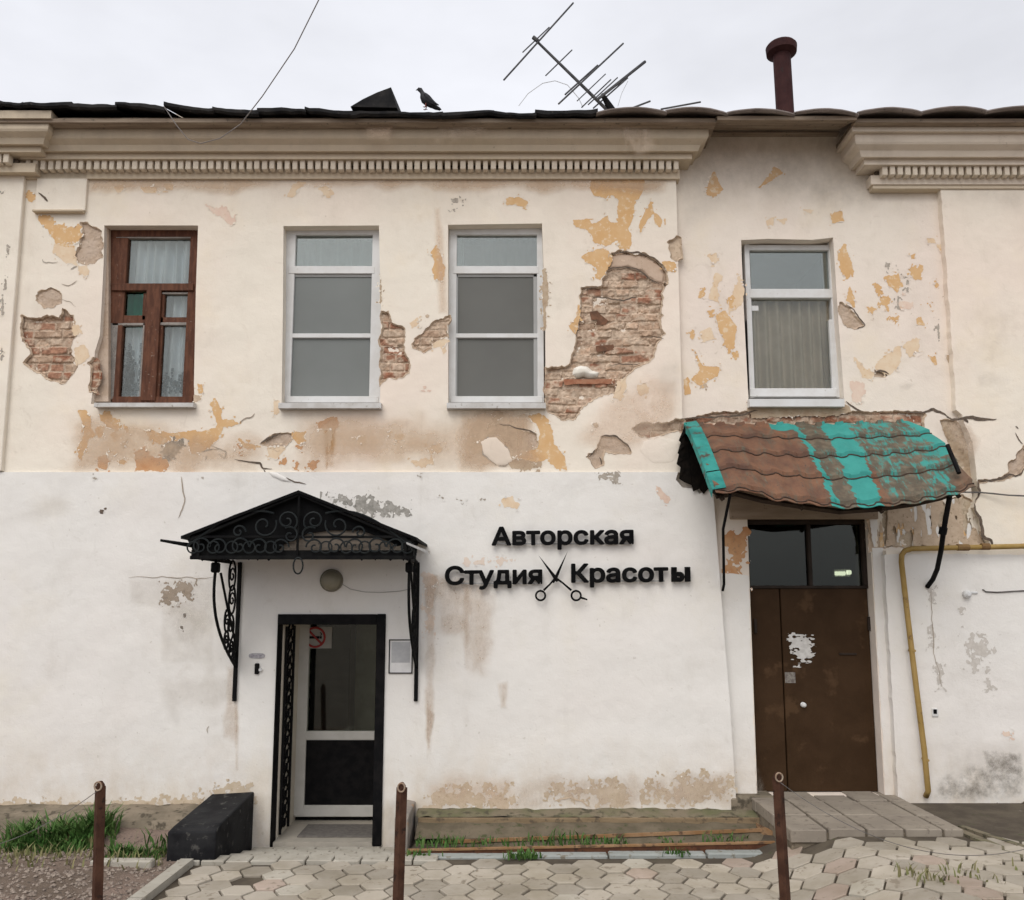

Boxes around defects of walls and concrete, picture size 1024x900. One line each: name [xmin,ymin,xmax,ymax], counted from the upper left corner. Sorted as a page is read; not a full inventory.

flaking render [37,214,104,279]
flaking render [20,288,102,395]
flaking render [375,274,452,387]
flaking render [476,180,683,472]
flaking render [631,244,949,439]
peeling [74,382,241,480]
crack [203,433,305,484]
flaking render [234,416,343,472]
flaking render [586,422,632,484]
peeling [320,490,412,518]
flaking render [864,494,985,553]
peeling [159,579,198,632]